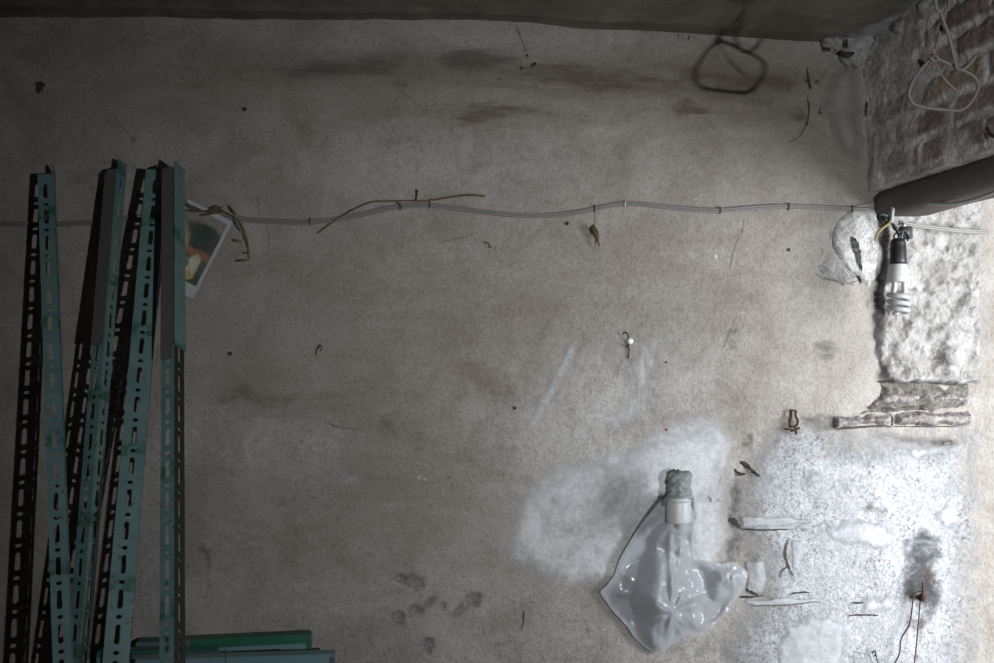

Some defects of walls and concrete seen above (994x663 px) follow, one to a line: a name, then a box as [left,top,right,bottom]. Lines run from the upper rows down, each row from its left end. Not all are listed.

peeling [818,200,883,288]
spalling [731,382,975,663]
damp [904,532,941,613]